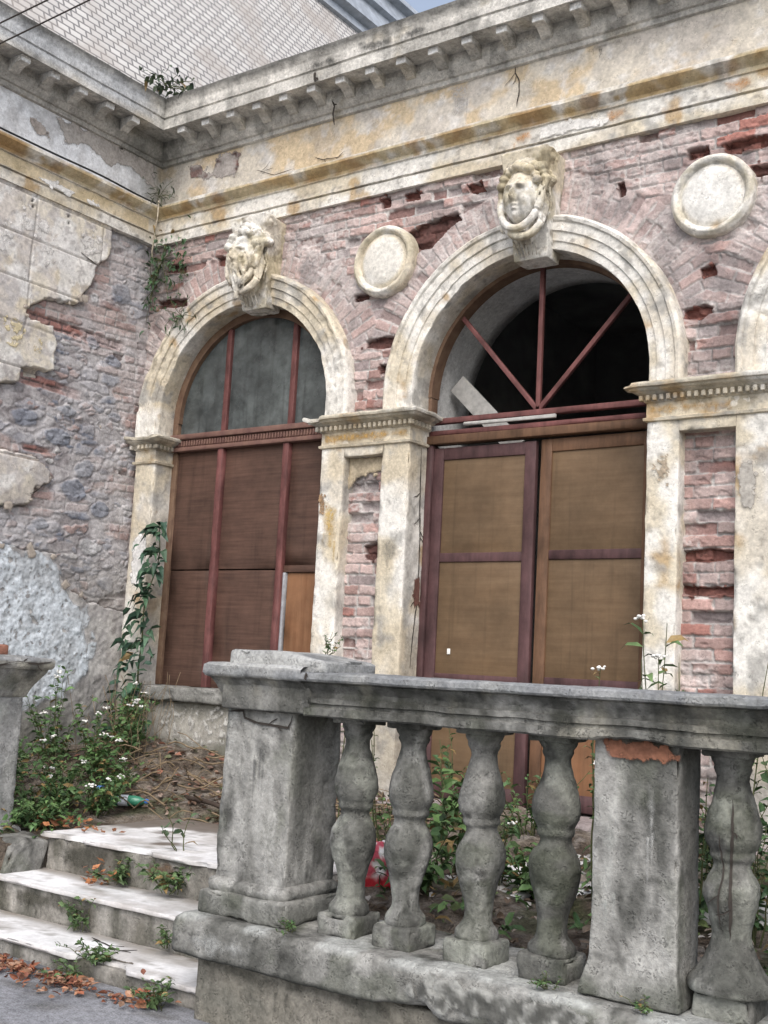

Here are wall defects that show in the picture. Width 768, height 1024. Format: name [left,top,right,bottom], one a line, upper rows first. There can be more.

crack [504,68,520,107]
spalling [30,117,155,187]
spalling [188,151,241,180]
peeling [39,177,75,197]
spalling [0,230,187,710]
peeling [348,456,383,489]
spalling [366,545,378,563]
spalling [686,549,734,563]
spalling [683,584,734,600]
spalling [603,738,680,764]